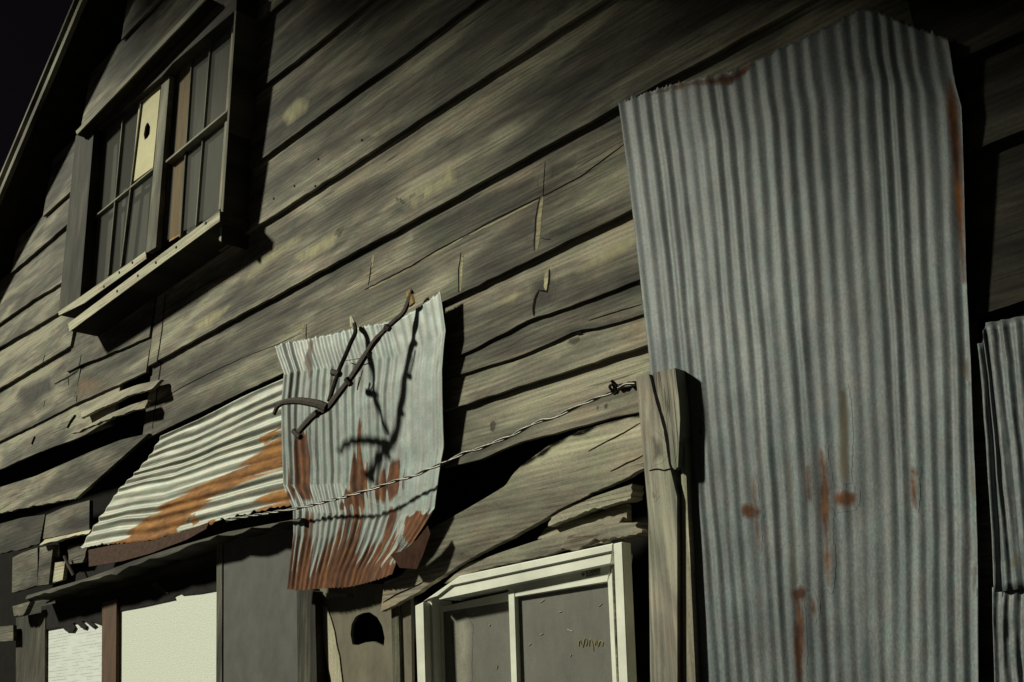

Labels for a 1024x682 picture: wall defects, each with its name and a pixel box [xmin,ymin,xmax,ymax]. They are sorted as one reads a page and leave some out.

crack [365,144,624,316]
rust [104,397,435,591]
crack [589,375,673,472]
rust [739,471,765,553]
rust [784,384,861,682]